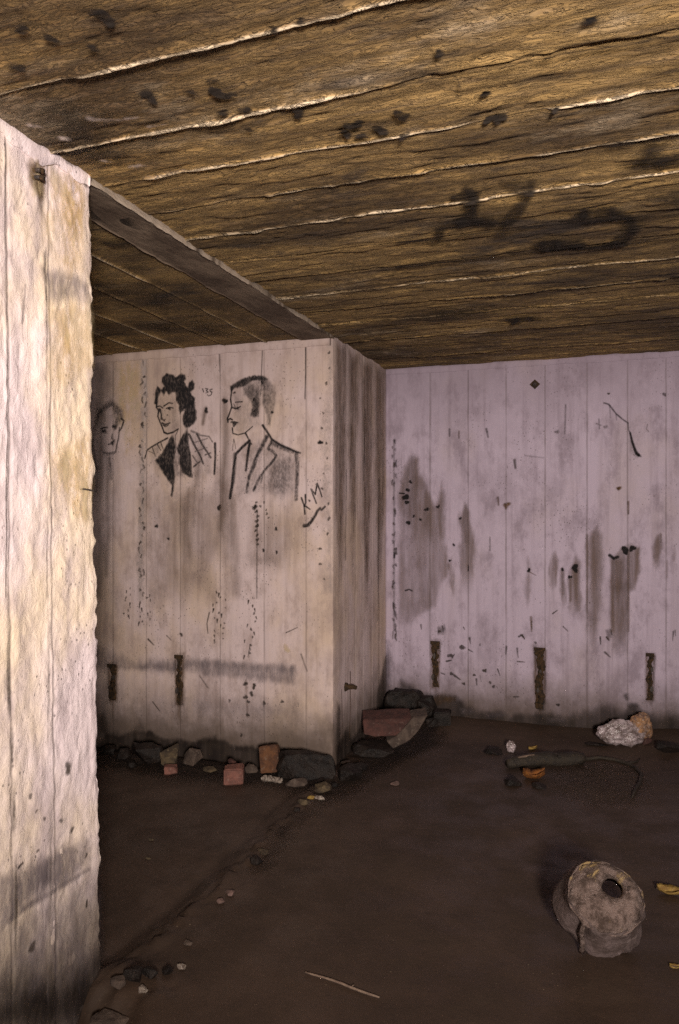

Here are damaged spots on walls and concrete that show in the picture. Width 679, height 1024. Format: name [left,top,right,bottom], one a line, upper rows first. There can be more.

damp [339,360,383,551]
damp [399,480,440,525]
damp [608,546,639,581]
corrosion [107,664,117,700]
corrosion [174,655,184,705]
corrosion [430,641,440,687]
corrosion [534,647,546,710]
corrosion [645,653,654,700]